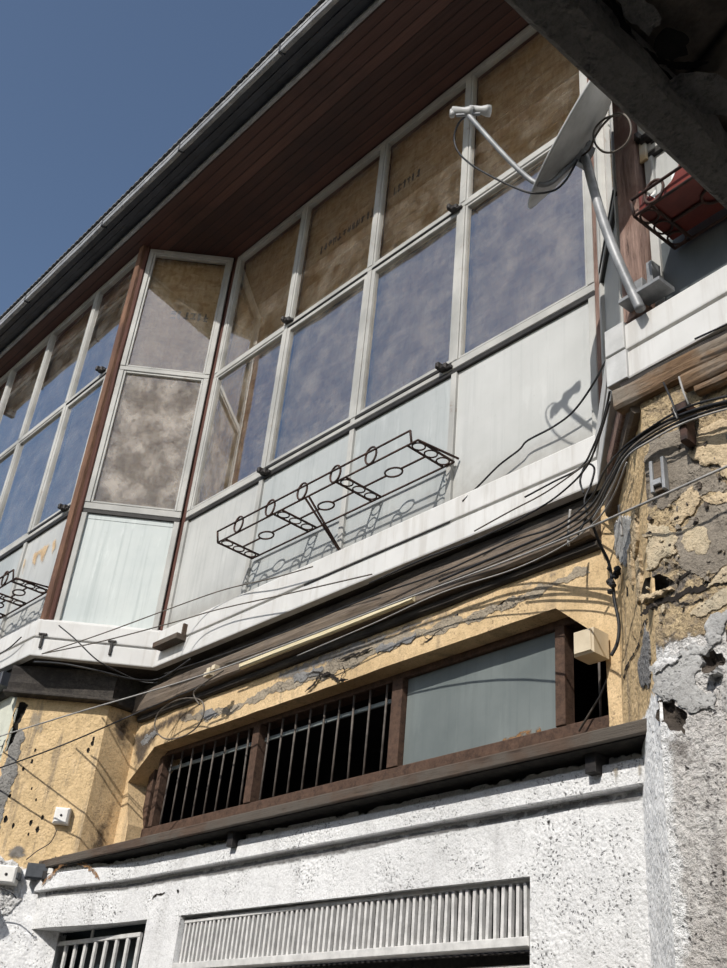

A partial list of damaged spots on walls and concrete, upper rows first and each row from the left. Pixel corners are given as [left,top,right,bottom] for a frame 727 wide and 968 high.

spalling [180,566,590,723]
peeling [614,418,727,735]
spalling [0,702,28,827]
spalling [0,856,24,916]